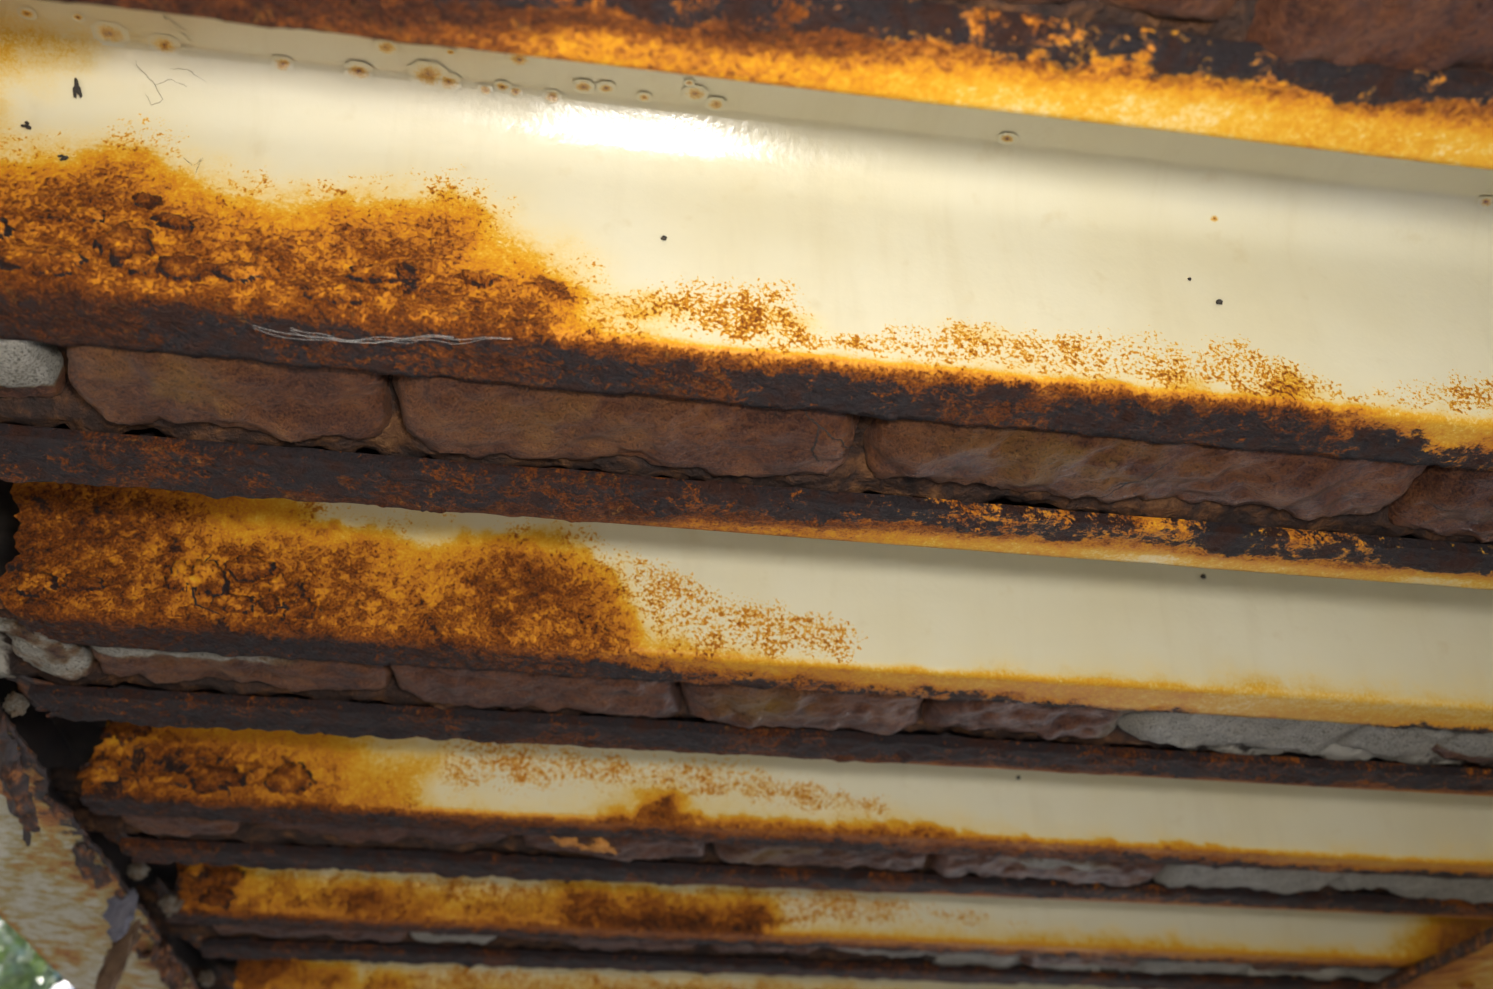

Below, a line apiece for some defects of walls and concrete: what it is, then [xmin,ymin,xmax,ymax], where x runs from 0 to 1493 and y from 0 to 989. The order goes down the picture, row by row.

corrosion [0,0,1493,471]
corrosion [0,423,1493,734]
corrosion [0,683,1493,989]